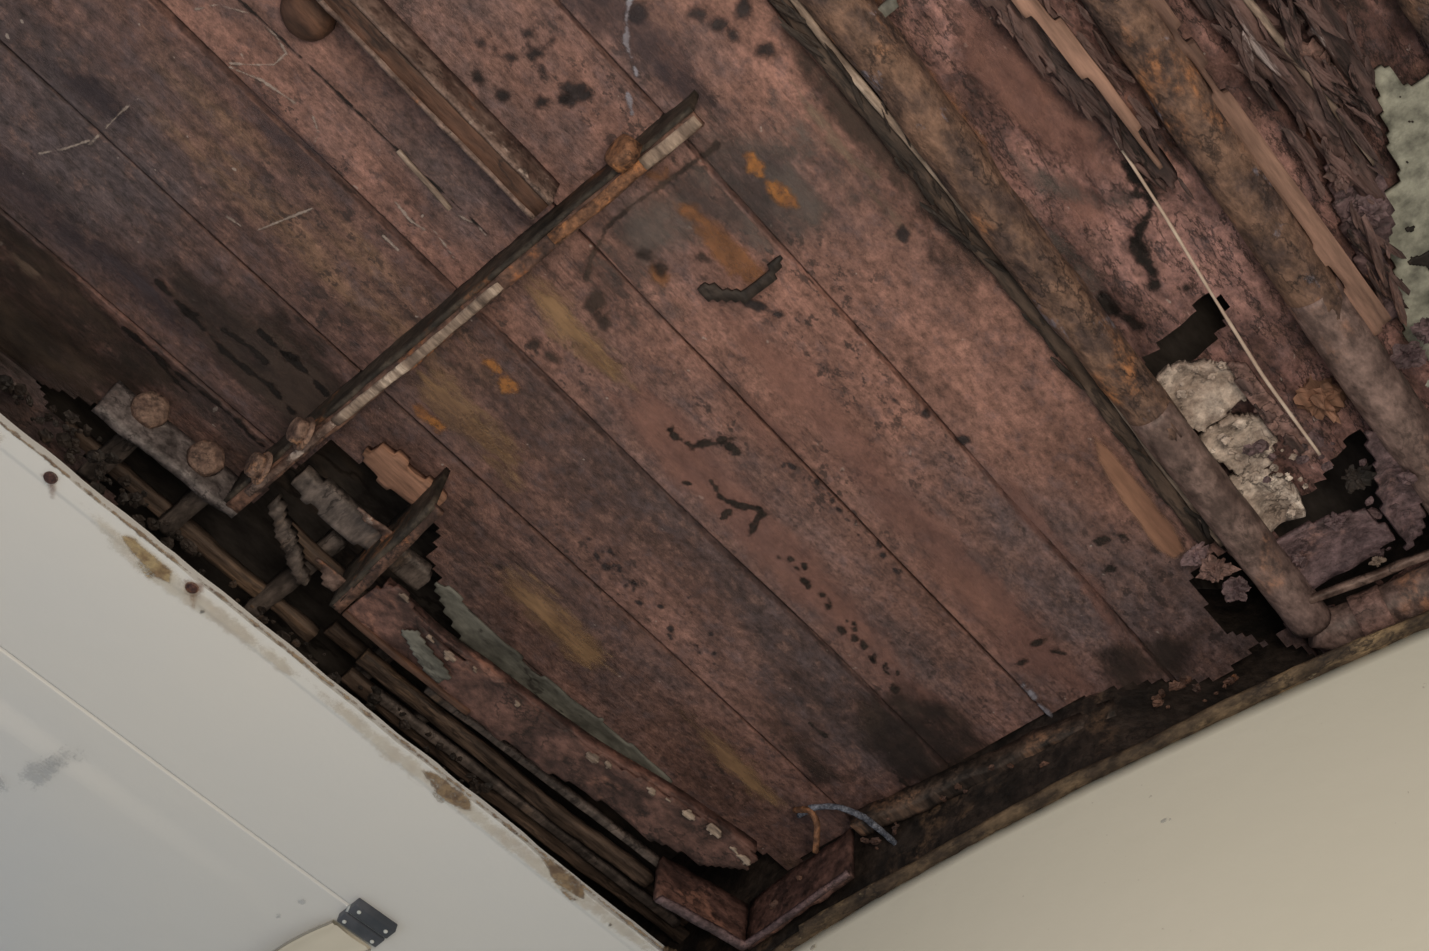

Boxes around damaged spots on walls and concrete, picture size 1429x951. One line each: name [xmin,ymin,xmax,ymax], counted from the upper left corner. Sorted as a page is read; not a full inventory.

water stain [623,0,648,76]
water stain [688,0,750,41]
water stain [757,42,775,57]
water stain [536,81,592,108]
corrosion [746,152,797,208]
spalling [1374,64,1429,360]
corrosion [91,89,721,518]
spalling [1156,358,1320,533]
peeling [1093,441,1183,557]
spalling [123,536,171,582]
corrosion [0,422,663,949]
spalling [424,771,470,810]